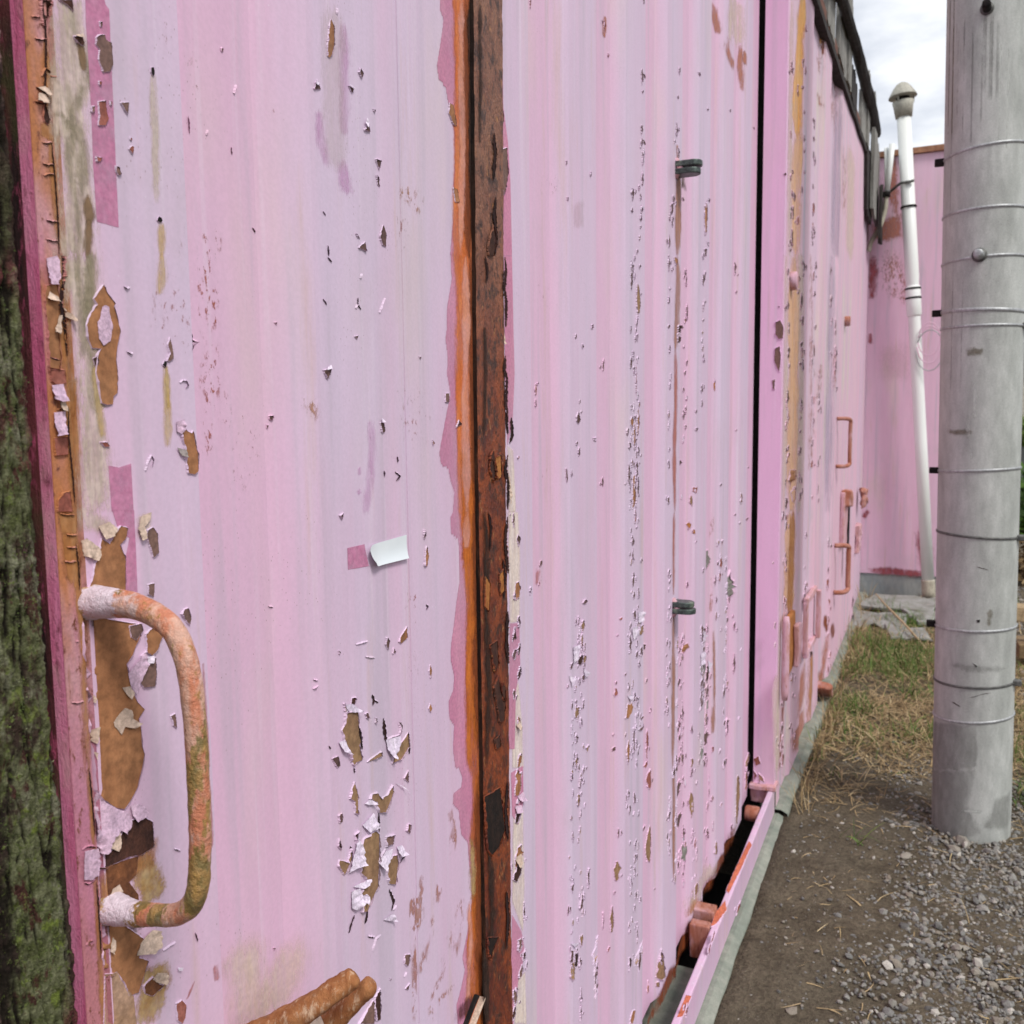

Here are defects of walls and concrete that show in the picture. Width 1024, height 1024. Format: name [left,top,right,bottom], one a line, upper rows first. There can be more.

corrosion [41,122,95,751]
peeling [43,256,133,512]
peeling [81,512,159,590]
peeling [82,618,163,901]
corrosion [134,847,165,901]
peeling [176,420,200,475]
peeling [329,694,413,951]
corrosion [452,0,510,1024]
corrosion [665,178,685,505]
peeling [611,125,766,899]
corrosion [772,616,834,768]
corrosion [772,0,836,629]